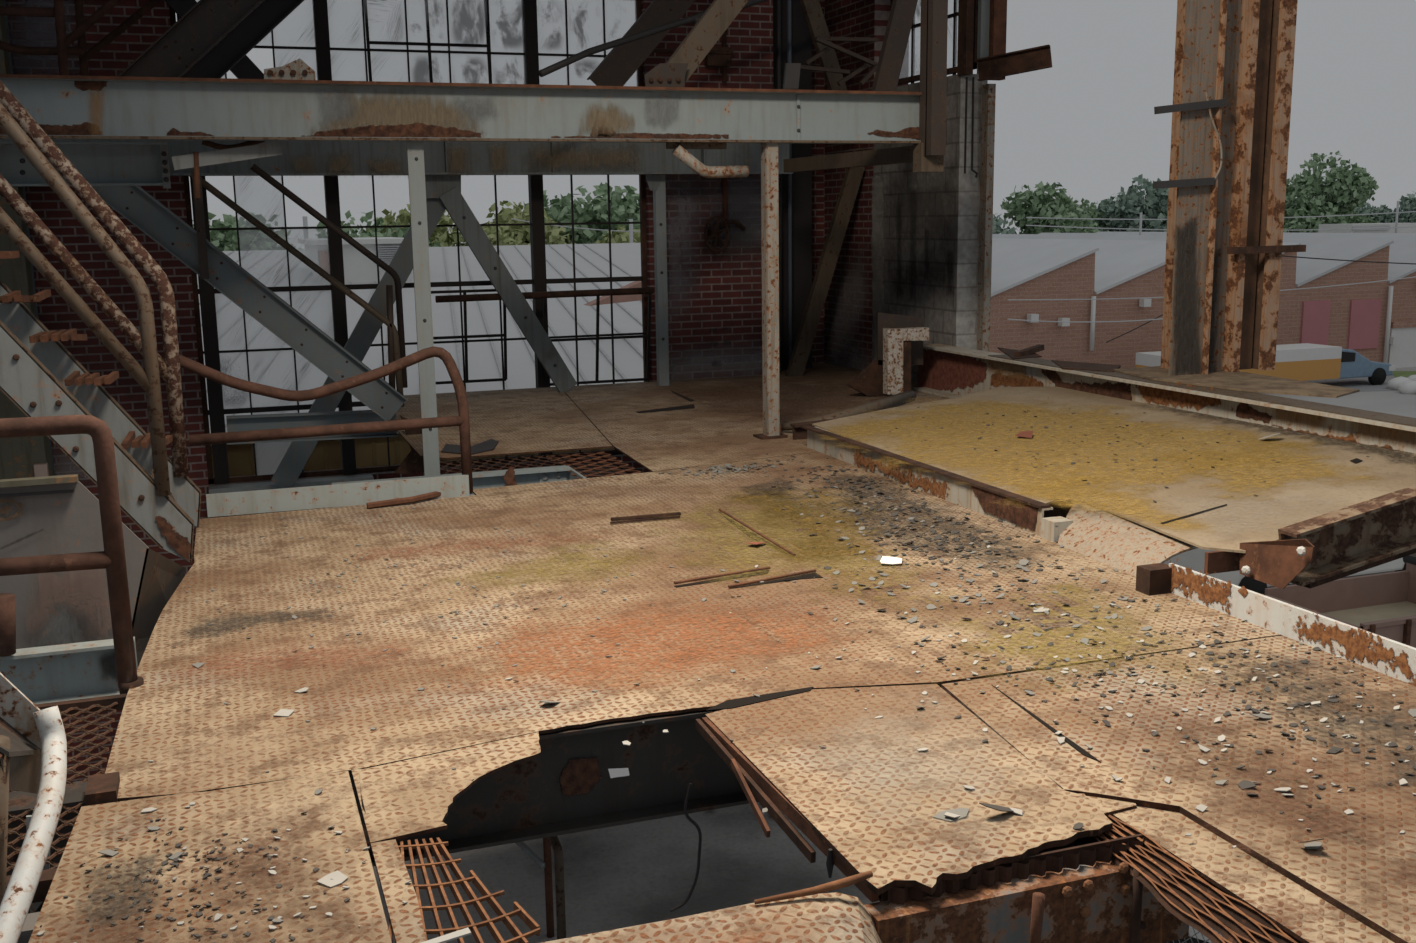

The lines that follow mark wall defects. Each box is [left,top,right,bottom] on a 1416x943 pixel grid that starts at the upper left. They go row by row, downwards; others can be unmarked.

corrosion [0,74,922,135]
corrosion [853,449,950,499]
corrosion [1164,555,1248,614]
corrosion [1290,611,1416,686]
peeling [608,768,629,778]